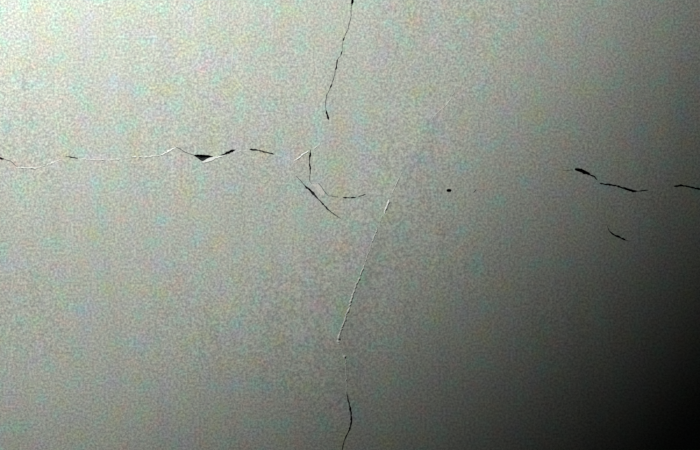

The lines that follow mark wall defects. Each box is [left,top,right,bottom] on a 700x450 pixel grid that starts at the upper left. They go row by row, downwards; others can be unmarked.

crack [325,0,354,120]
crack [0,147,194,170]
crack [563,168,647,192]
crack [336,172,402,450]